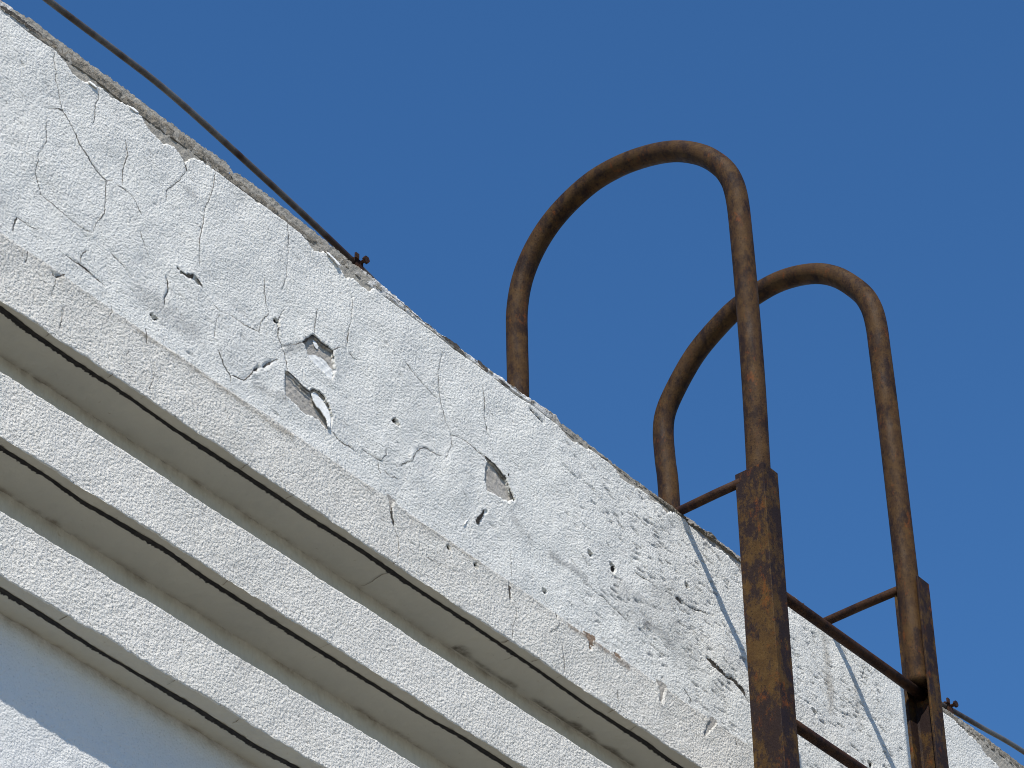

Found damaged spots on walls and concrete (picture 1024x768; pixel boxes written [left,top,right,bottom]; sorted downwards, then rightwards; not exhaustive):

crack [1,6,149,337]
crack [166,156,216,264]
crack [214,234,318,381]
peeling [285,371,331,429]
peeling [302,335,334,379]
peeling [484,456,514,501]